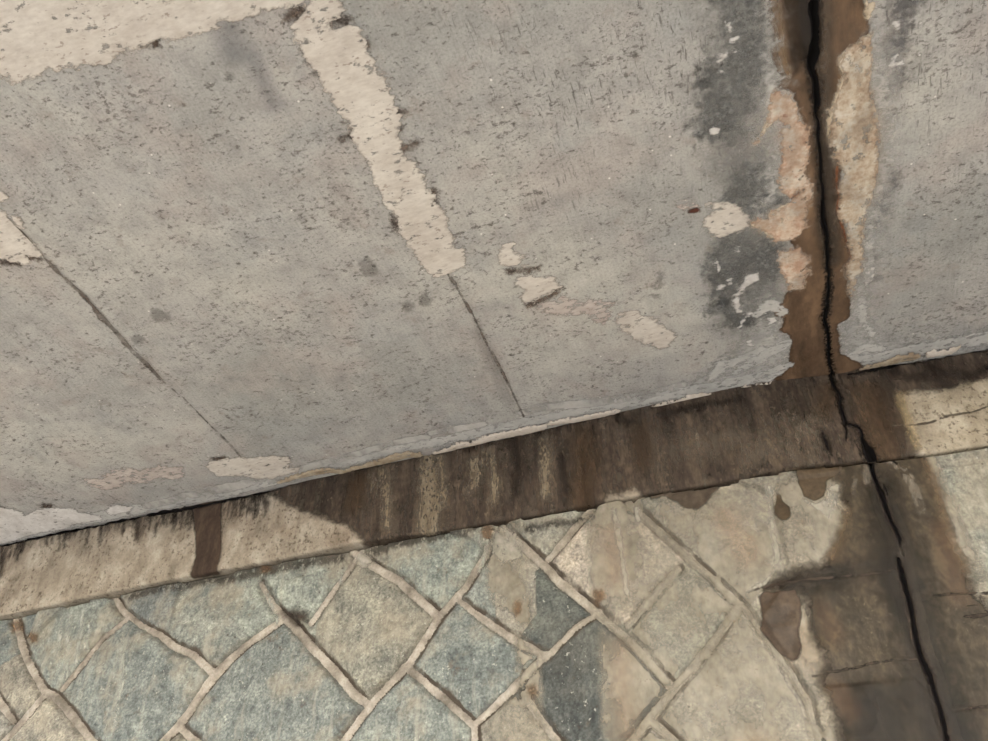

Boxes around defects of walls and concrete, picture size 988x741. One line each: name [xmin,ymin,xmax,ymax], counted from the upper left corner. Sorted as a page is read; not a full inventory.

peeling [0,0,466,278]
leakage [60,369,788,579]
peeling [498,242,677,350]
leakage [262,0,944,741]
crack [754,0,988,741]
leakage [815,0,988,741]